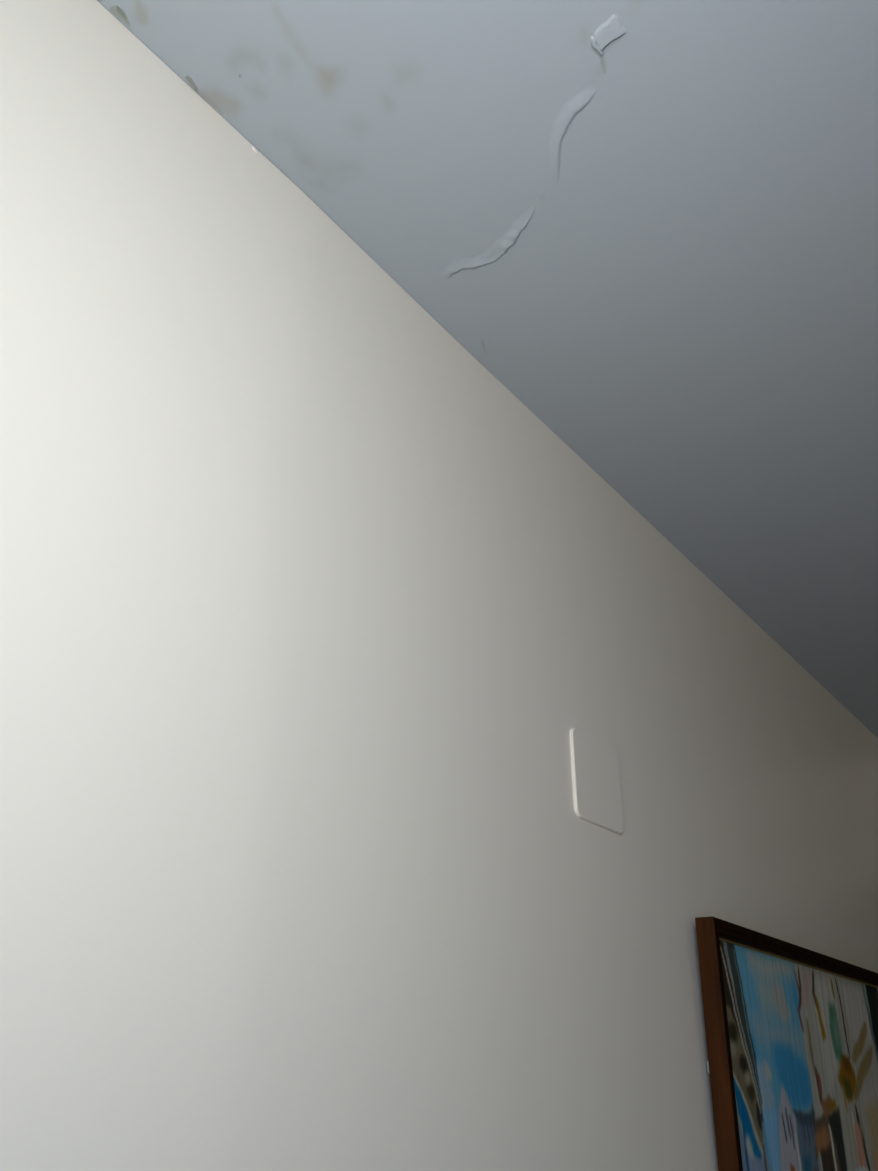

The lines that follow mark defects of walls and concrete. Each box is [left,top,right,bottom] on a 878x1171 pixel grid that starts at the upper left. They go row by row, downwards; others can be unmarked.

damp [189,0,434,199]
peeling [590,14,630,76]